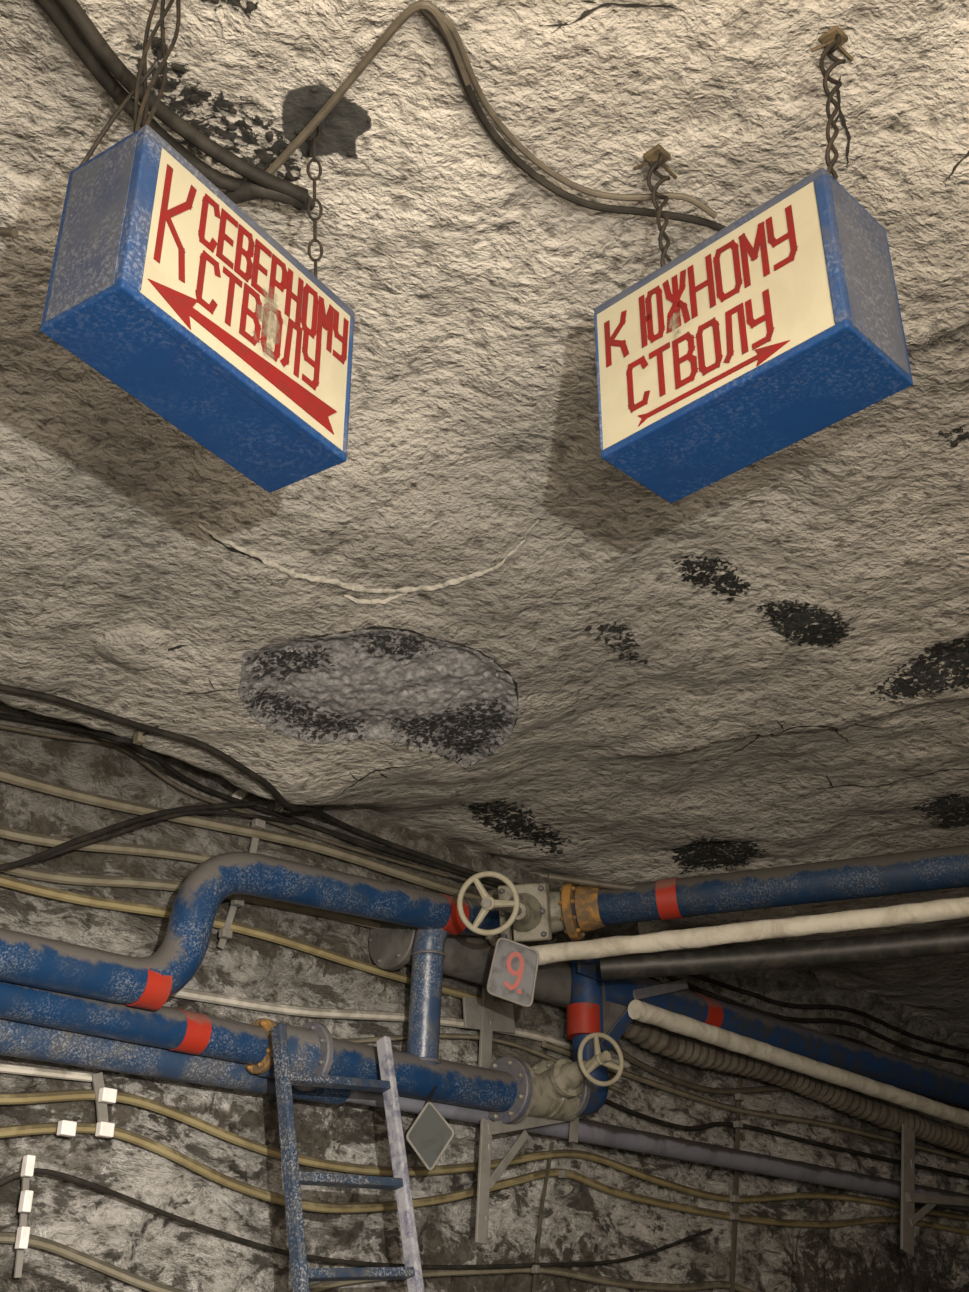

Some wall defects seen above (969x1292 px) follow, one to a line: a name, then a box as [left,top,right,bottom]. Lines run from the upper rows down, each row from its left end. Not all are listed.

crack [540,0,680,34]